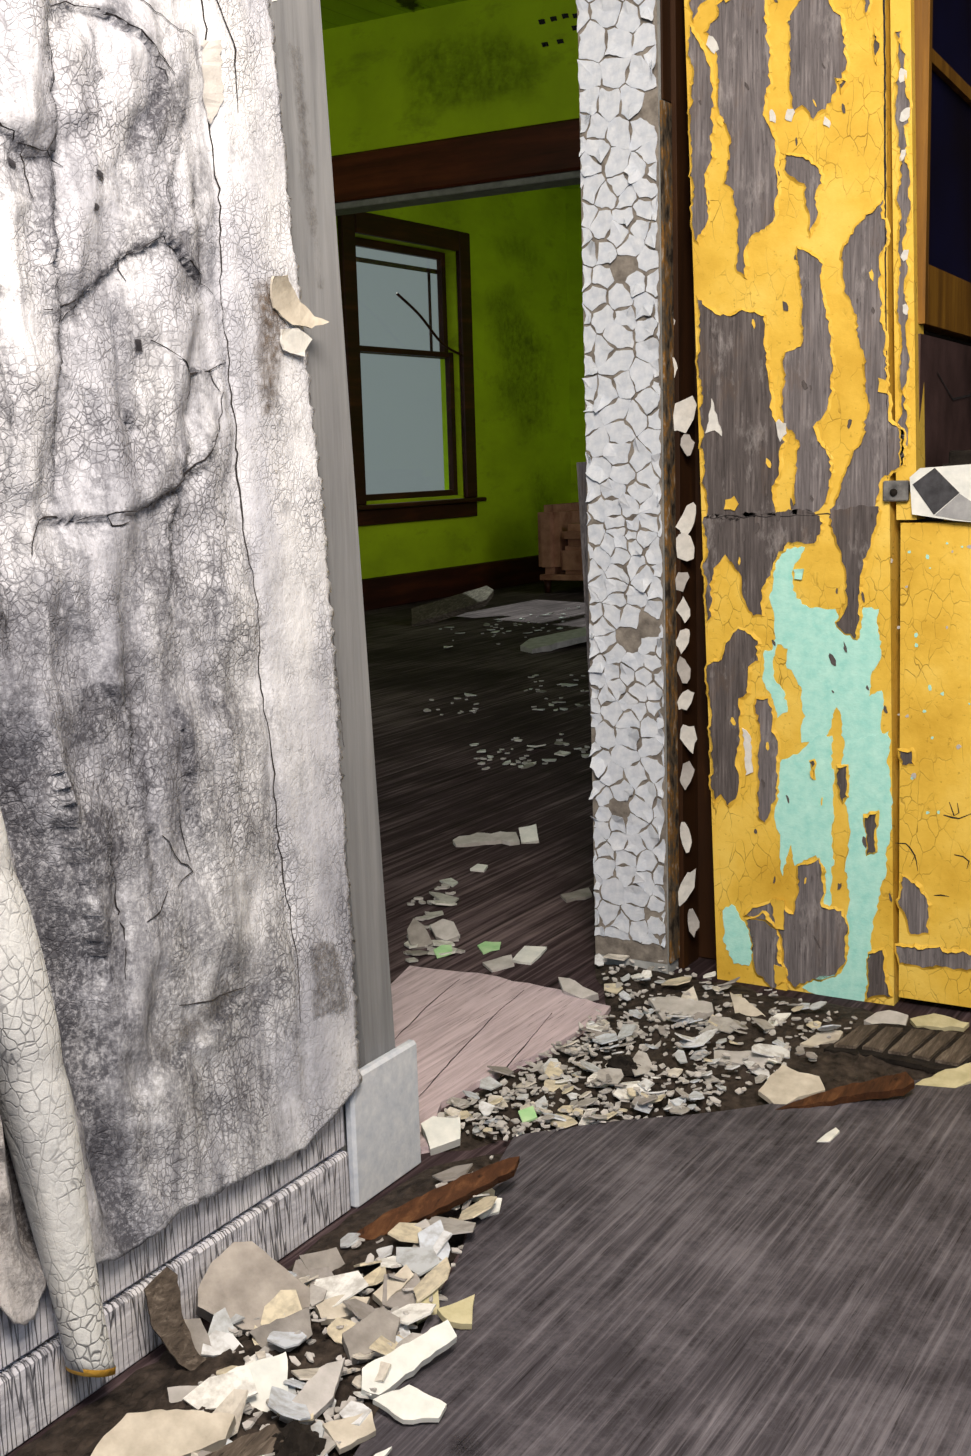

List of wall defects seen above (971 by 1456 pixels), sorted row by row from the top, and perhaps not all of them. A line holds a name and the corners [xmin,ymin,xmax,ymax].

crack [0,122,63,199]
crack [32,0,301,1022]
crack [576,0,668,964]
peeling [672,0,971,1002]